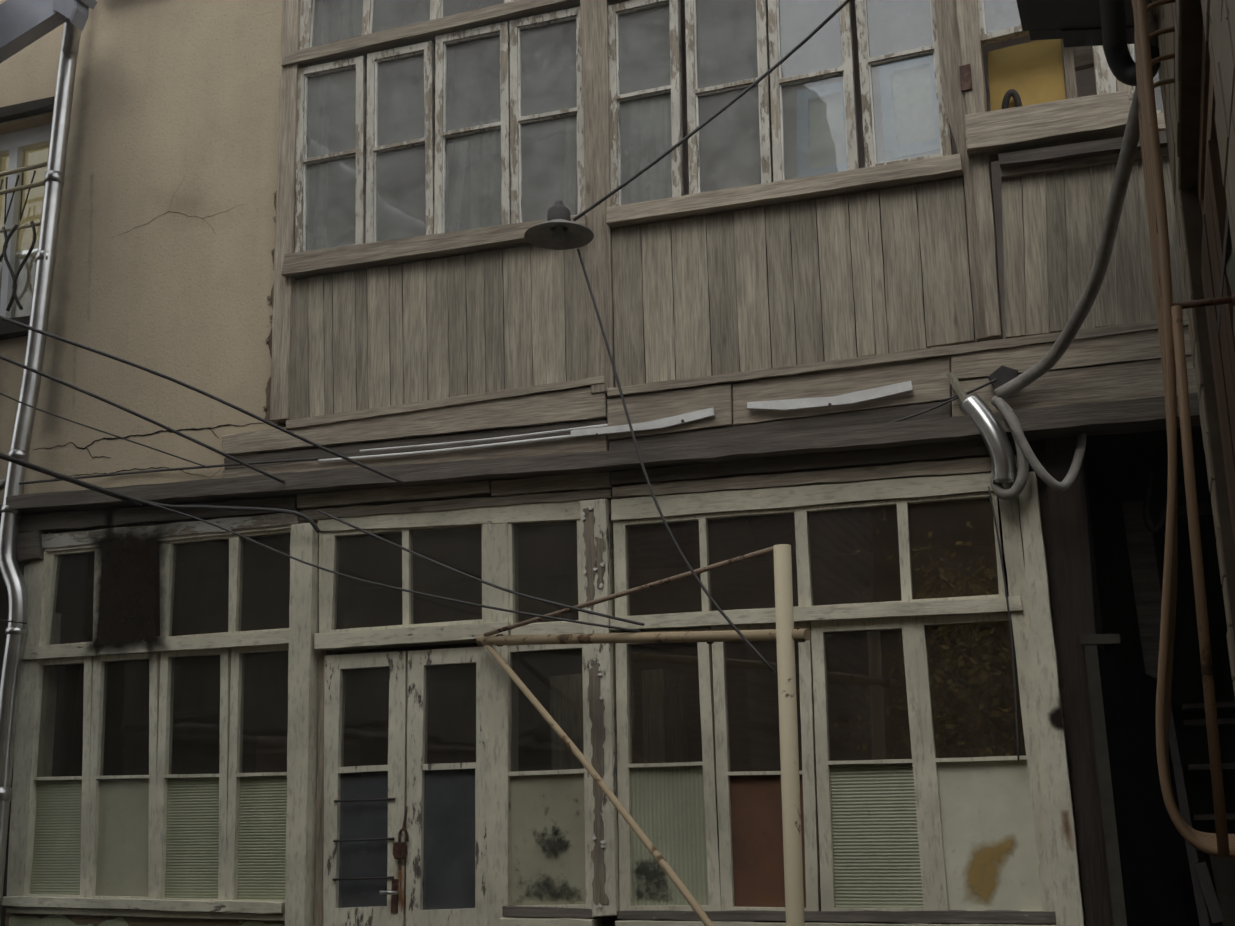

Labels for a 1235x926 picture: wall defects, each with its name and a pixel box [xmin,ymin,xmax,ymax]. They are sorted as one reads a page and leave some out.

crack [34,423,262,479]
peeling [70,908,107,926]
peeling [123,909,285,926]